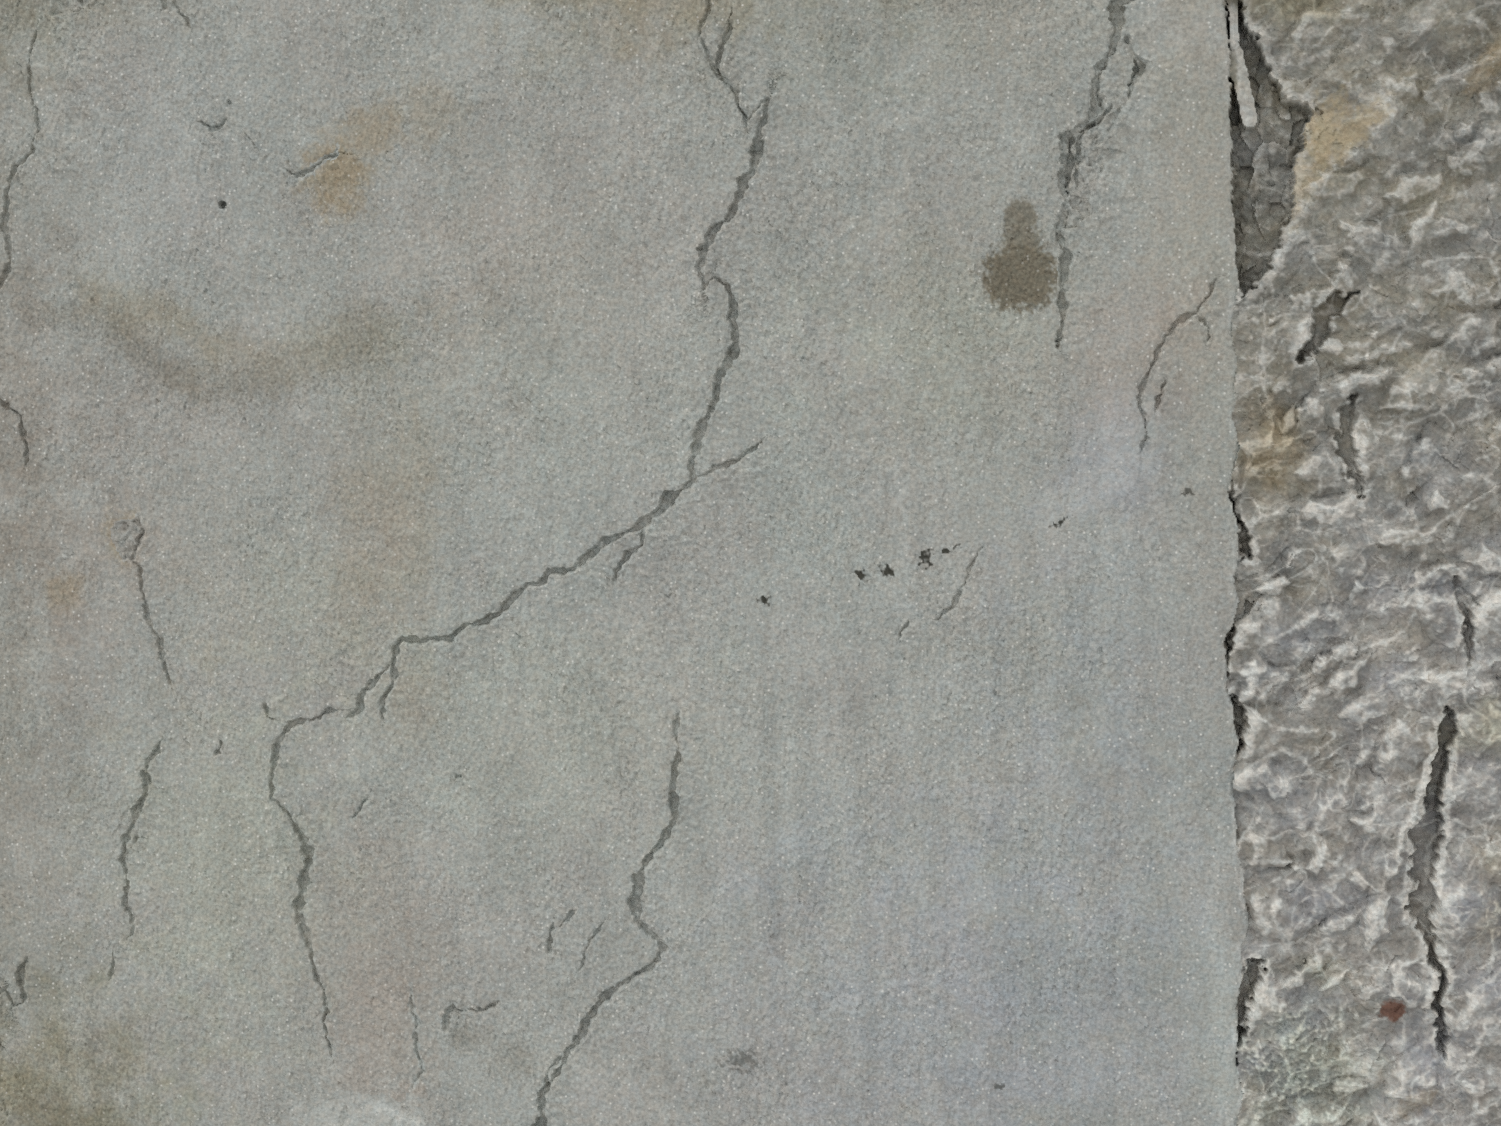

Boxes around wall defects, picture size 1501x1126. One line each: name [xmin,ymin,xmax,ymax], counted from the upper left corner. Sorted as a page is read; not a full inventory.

crack [0,12,99,298]
crack [194,112,340,181]
leakage [969,195,1058,323]
crack [1052,0,1155,356]
crack [0,397,31,472]
crack [259,0,796,1126]
crack [1450,573,1482,669]
crack [0,949,33,1051]
crack [105,512,178,1030]
crack [1402,702,1461,1066]